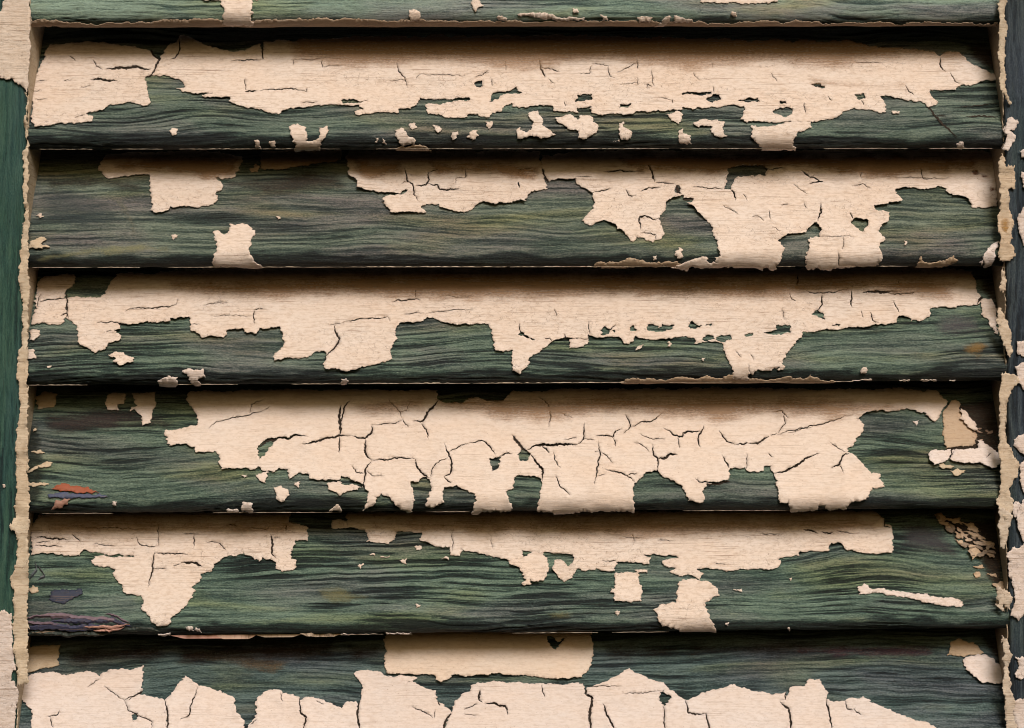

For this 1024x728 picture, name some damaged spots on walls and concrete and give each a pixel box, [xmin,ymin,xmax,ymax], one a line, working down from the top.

peeling [0,0,1019,384]
peeling [9,140,315,686]
crack [260,399,846,493]
peeling [157,362,1024,633]
peeling [0,610,245,728]
crack [91,680,197,728]
crack [415,691,508,728]
peeling [248,631,936,728]
crack [584,686,614,728]
crack [632,691,710,728]
crack [780,693,792,728]
peeling [947,625,1024,728]